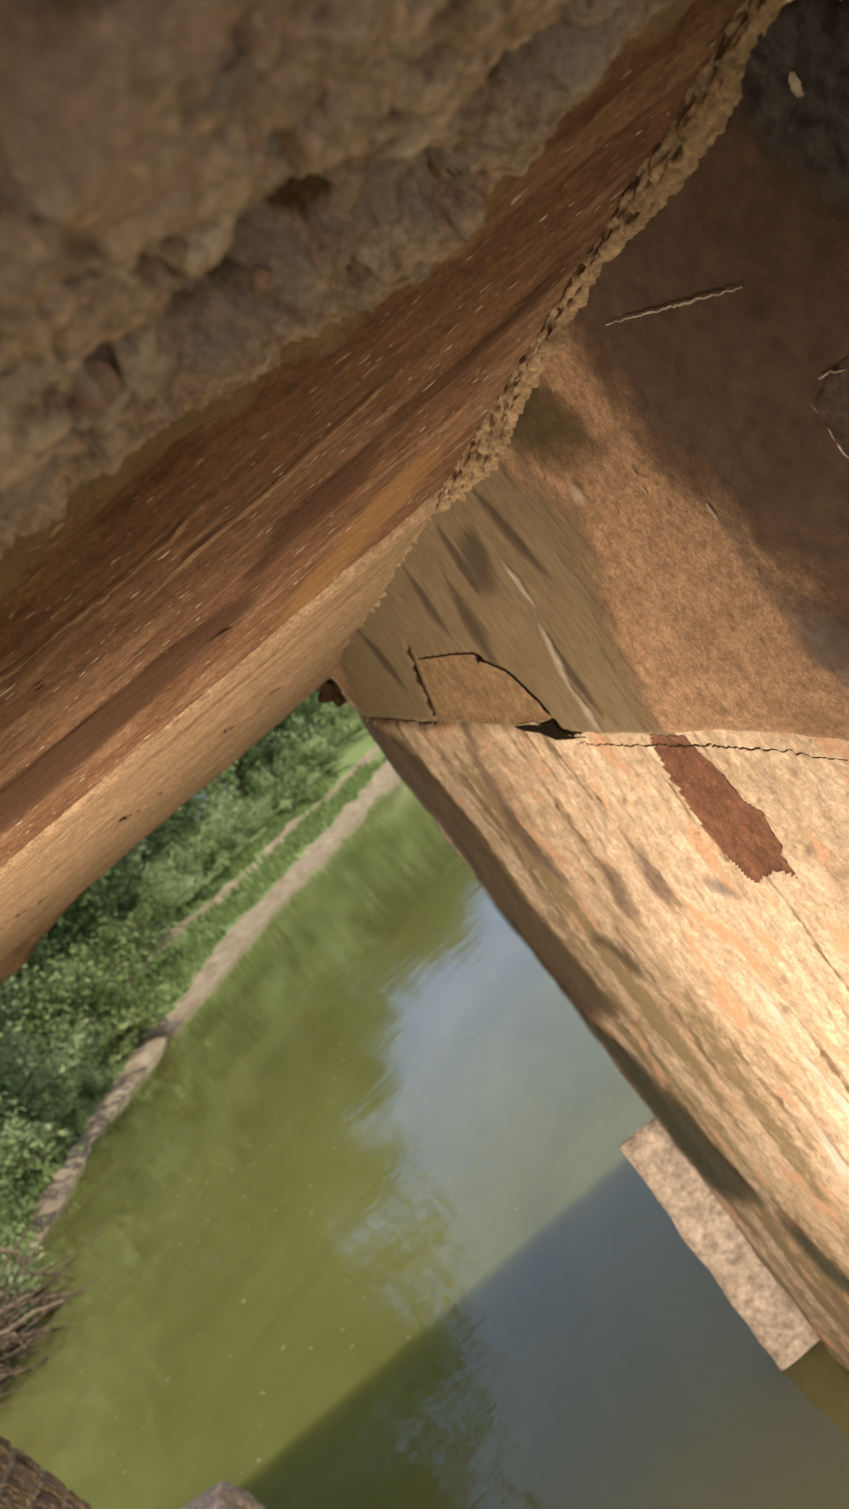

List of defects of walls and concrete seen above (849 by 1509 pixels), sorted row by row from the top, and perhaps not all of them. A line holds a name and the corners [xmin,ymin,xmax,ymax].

peeling [788,71,804,98]
crack [373,646,443,726]
crack [576,741,848,761]